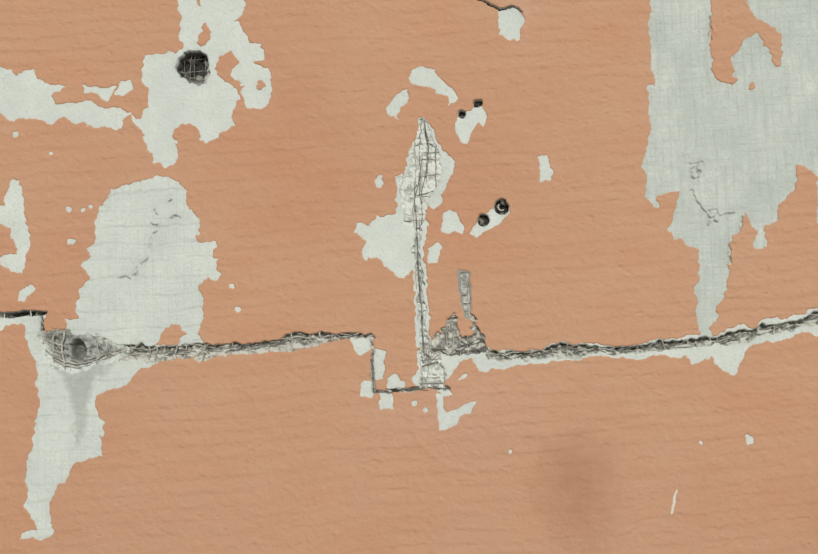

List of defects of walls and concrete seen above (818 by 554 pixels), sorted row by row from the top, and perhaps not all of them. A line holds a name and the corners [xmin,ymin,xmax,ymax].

crack [478,0,522,13]
peeling [386,66,458,119]
peeling [455,106,487,144]
peeling [0,0,272,348]
peeling [641,0,818,347]
peeling [350,117,510,410]
crack [0,308,818,394]
peeling [20,317,159,540]
peeling [412,390,476,430]